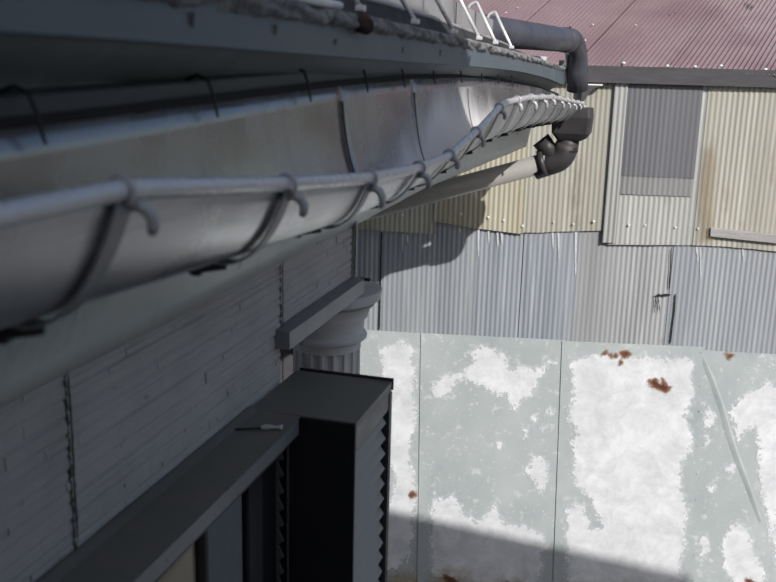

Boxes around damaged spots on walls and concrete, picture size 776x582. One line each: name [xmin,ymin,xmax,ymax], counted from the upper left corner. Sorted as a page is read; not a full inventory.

leakage [430,345,558,411]
rust [602,350,632,366]
rust [648,378,672,393]
leakage [378,340,419,571]
leakage [523,456,550,493]
leakage [564,353,717,582]
leakage [721,379,776,582]
leakage [427,492,549,582]